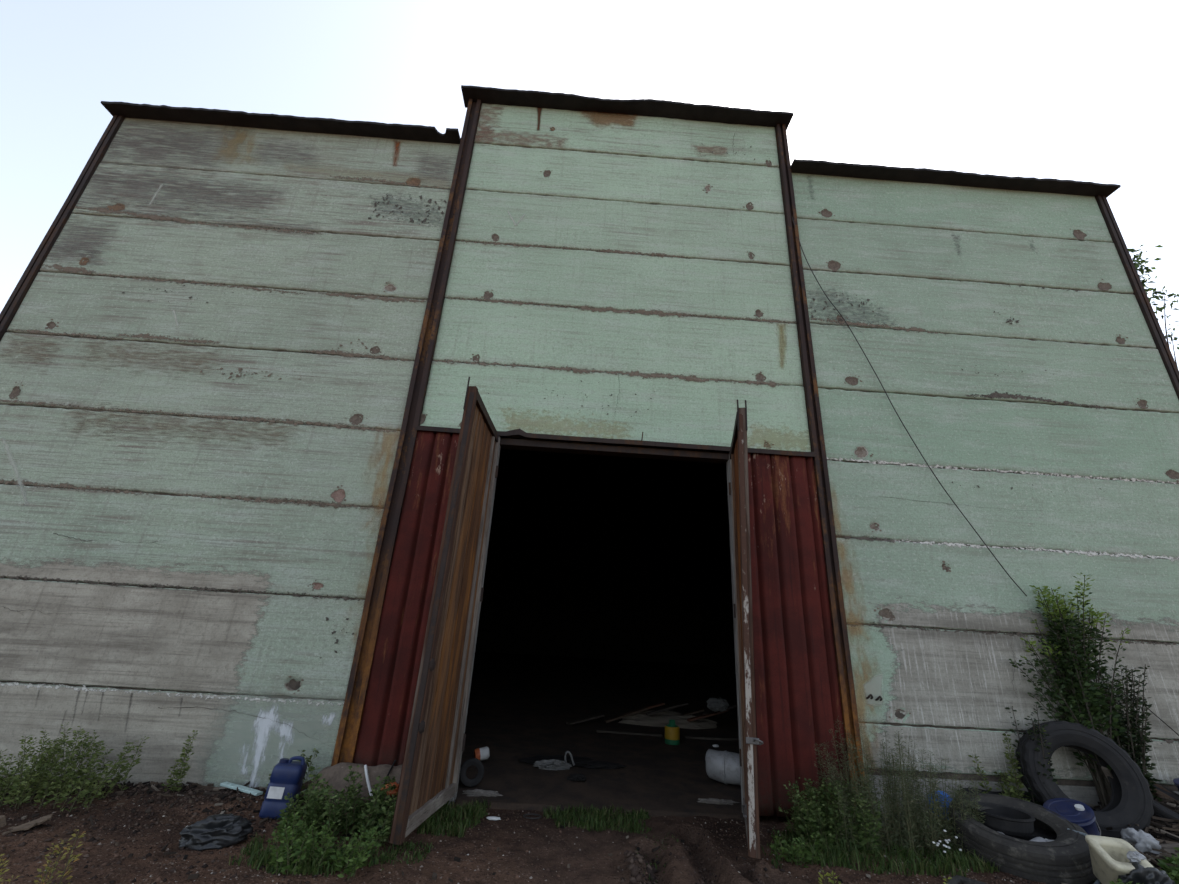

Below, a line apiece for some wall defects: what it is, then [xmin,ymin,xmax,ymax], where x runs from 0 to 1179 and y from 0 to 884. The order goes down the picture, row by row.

rust [475,107,561,146]
rust [584,111,635,126]
peeling [0,559,359,786]
peeling [846,597,1179,784]
leakage [275,723,293,759]